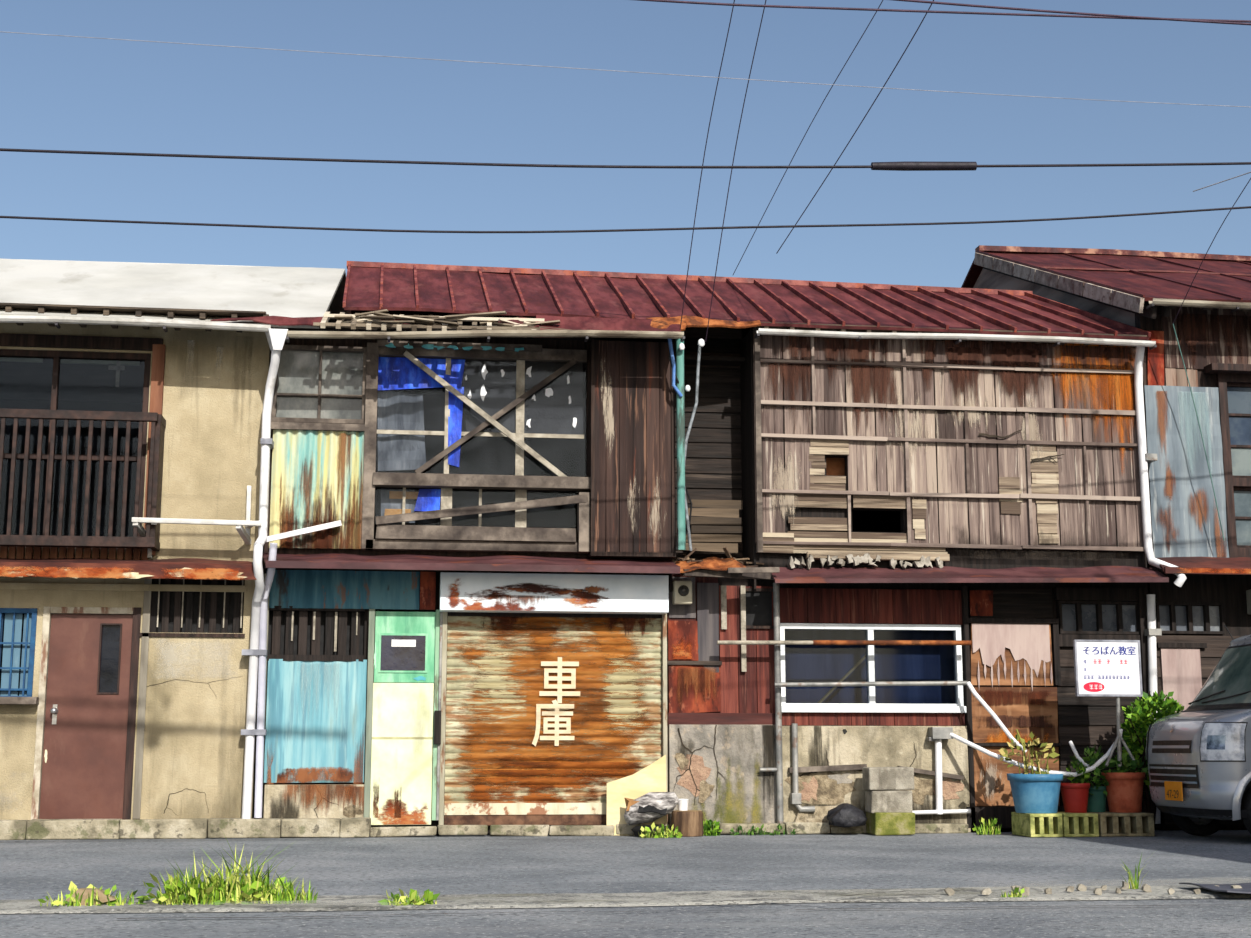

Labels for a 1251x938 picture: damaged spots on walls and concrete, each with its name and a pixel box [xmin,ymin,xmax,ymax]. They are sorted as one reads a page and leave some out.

leakage [768,336,897,434]
leakage [913,339,1061,415]
rust [1055,343,1136,455]
rust [1157,391,1168,451]
leakage [1177,313,1251,363]
rust [0,566,132,579]
rust [161,568,242,580]
rust [280,433,363,549]
rust [1161,468,1177,550]
rust [1180,491,1251,574]
rust [448,579,657,815]
rust [267,738,364,819]